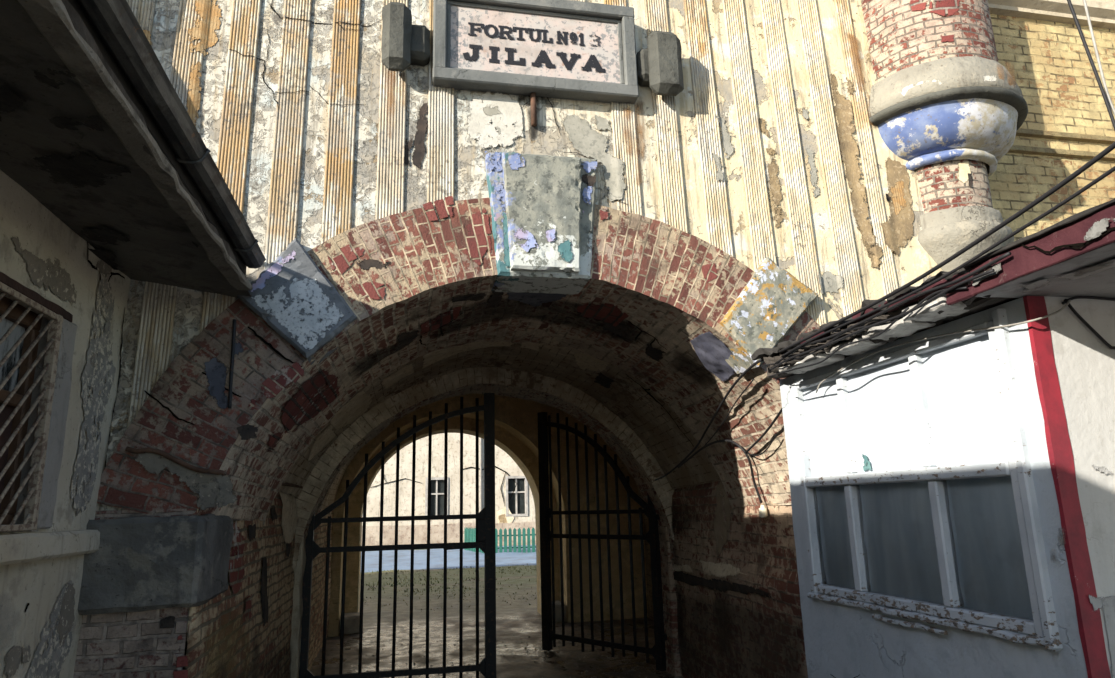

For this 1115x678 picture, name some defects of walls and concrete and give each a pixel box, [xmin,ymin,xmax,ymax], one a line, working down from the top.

peeling [186,0,221,125]
crack [229,0,382,110]
flaking render [423,151,573,267]
peeling [582,161,618,220]
spalling [713,116,733,181]
spalling [759,118,783,228]
spalling [831,74,914,268]
flaking render [328,244,391,300]
flaking render [702,263,717,283]
peeling [71,227,130,516]
crack [87,242,195,467]
peeling [4,581,75,678]